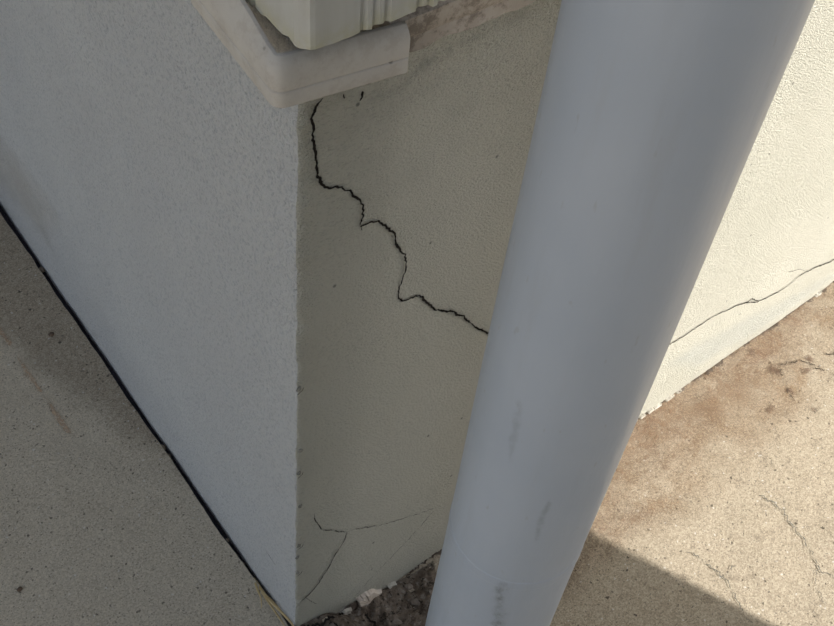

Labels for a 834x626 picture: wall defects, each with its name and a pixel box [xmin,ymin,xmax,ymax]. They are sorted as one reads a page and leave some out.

crack [310,98,489,334]
crack [639,259,834,419]
spalling [300,561,436,626]
crack [303,506,442,626]